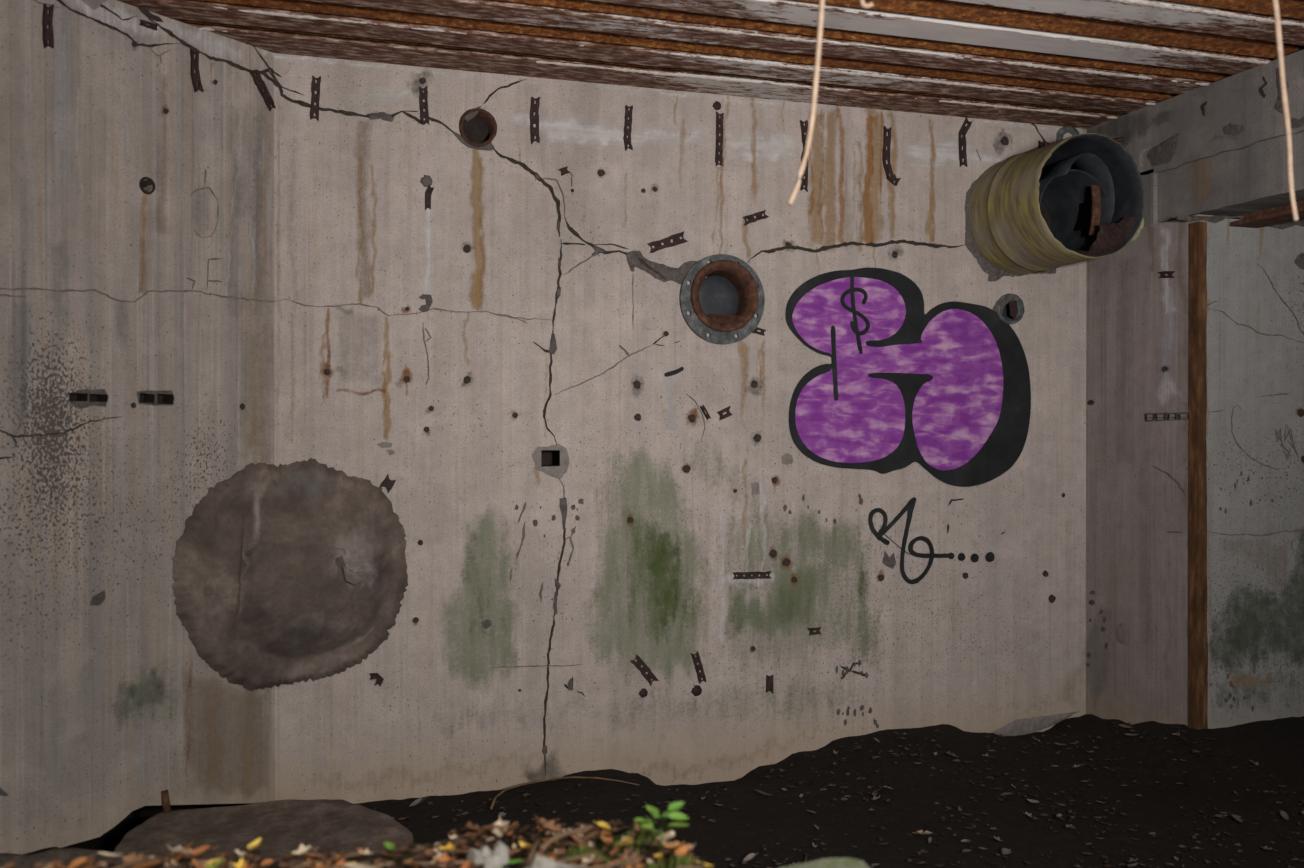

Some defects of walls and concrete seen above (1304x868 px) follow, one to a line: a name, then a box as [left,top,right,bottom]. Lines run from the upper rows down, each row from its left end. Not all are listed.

crack [34,0,455,133]
crack [0,149,656,444]
rust [472,149,485,310]
rust [810,105,844,245]
rust [860,109,895,247]
crack [495,482,582,777]
leakage [1210,534,1304,687]